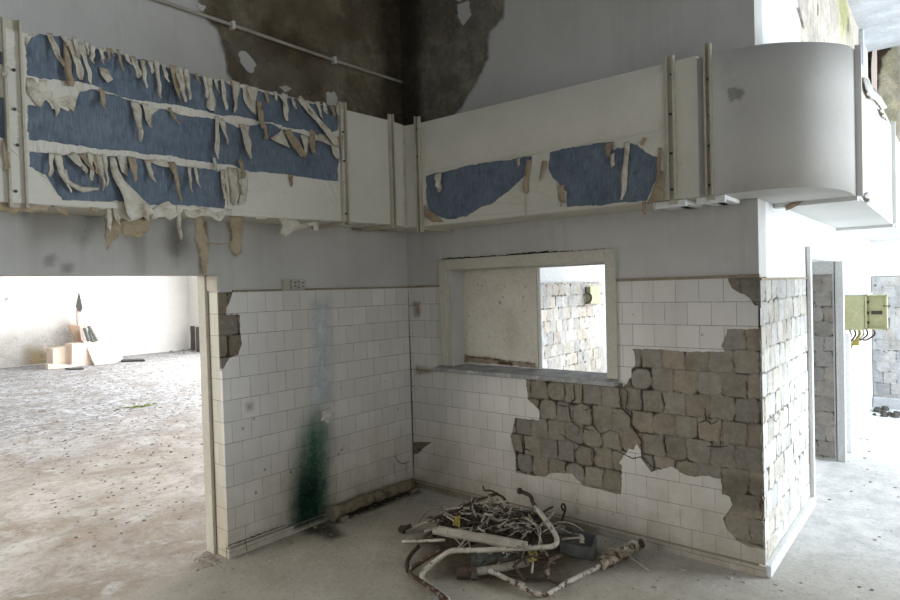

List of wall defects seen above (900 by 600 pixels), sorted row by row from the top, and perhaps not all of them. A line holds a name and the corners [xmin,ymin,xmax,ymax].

peeling [0,97,11,171]
peeling [25,31,343,240]
peeling [424,137,664,222]
spalling [219,292,242,369]
crack [557,385,661,470]
spalling [511,274,835,561]
crack [700,408,727,448]
water stain [298,476,341,538]
water stain [346,492,418,517]